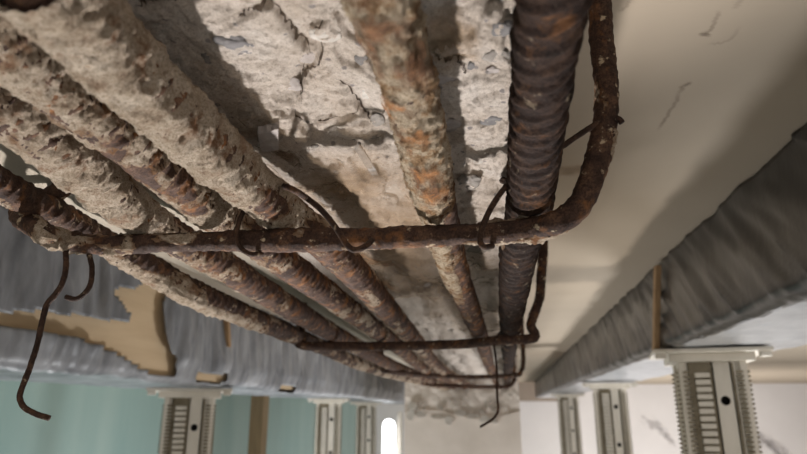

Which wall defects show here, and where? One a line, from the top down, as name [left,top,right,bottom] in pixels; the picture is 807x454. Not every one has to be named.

spalling [0,0,594,235]
spalling [99,243,541,391]